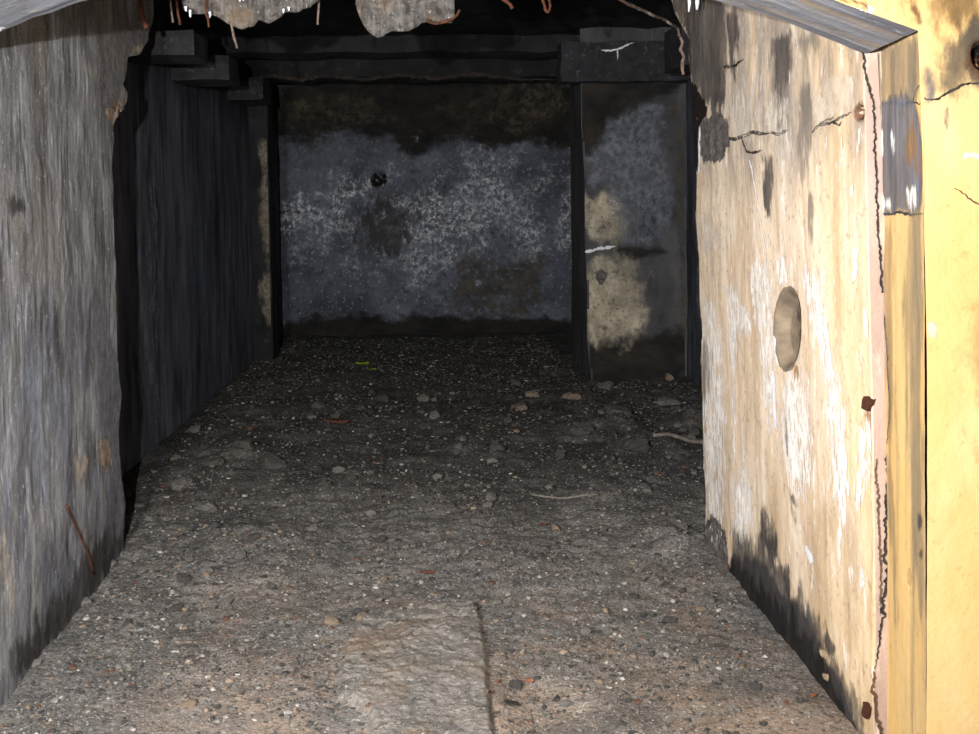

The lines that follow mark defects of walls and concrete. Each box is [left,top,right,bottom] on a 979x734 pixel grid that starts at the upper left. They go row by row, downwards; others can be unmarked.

spalling [182,0,319,29]
spalling [355,0,455,38]
rust [619,0,685,75]
leakage [727,13,739,79]
rust [854,103,865,121]
crack [812,52,923,293]
leakage [881,41,934,238]
crack [910,82,977,105]
leakage [911,406,922,565]
rust [65,504,95,574]
leakage [761,511,777,564]
crack [870,317,890,734]